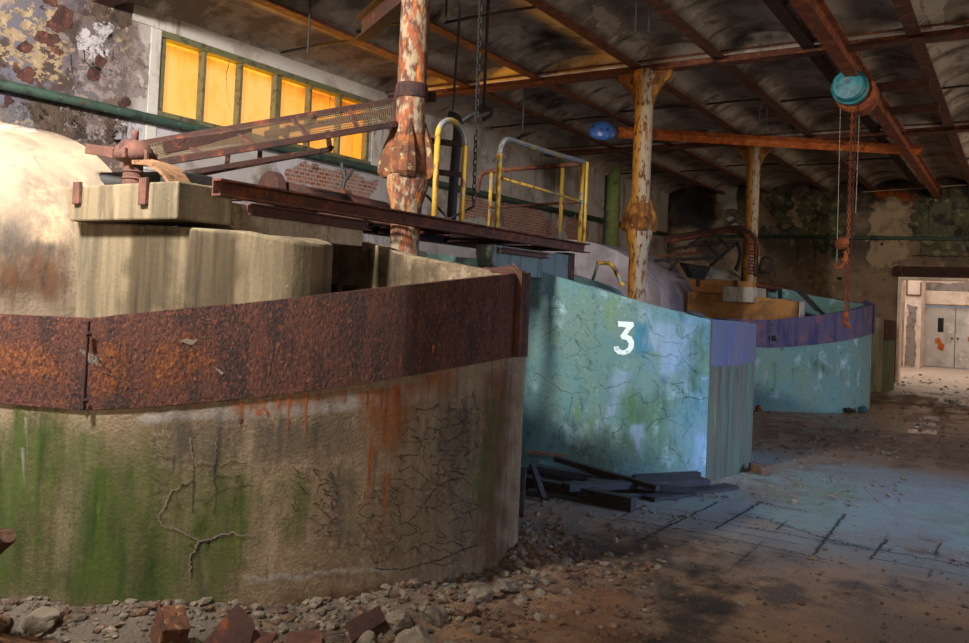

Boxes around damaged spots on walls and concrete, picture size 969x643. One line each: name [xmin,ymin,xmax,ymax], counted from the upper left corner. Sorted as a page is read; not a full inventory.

peeling [0,0,189,155]
rust [0,330,62,392]
rust [89,326,224,399]
crack [535,293,709,466]
crack [154,435,259,577]
crack [289,392,480,571]
crack [607,501,969,566]